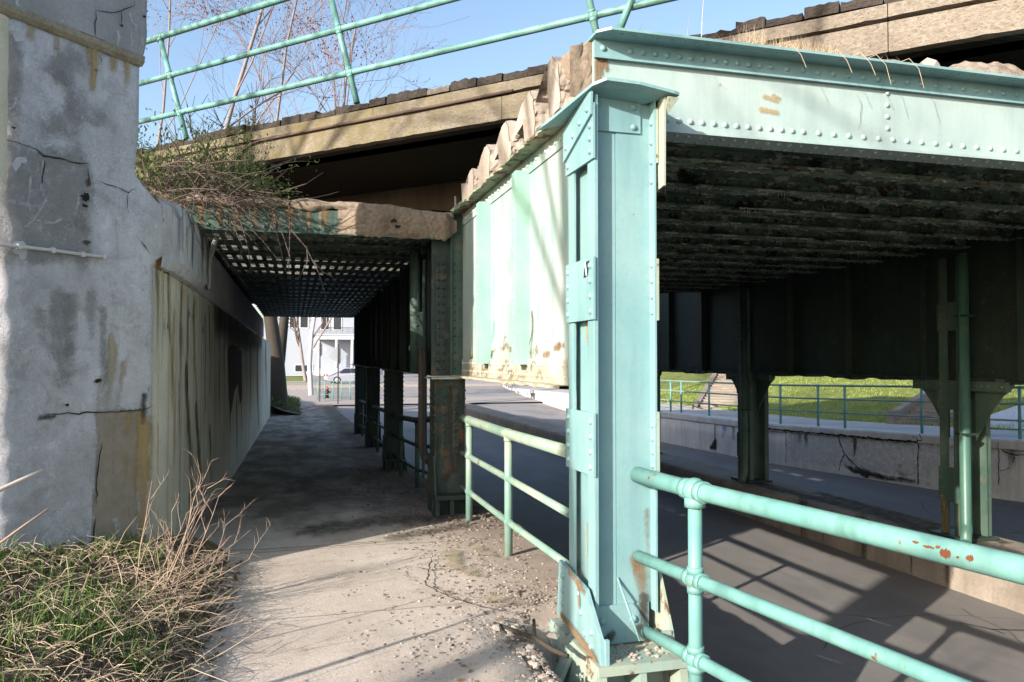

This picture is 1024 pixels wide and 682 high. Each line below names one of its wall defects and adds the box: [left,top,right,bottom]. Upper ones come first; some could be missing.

crack [94,2,135,62]
crack [7,140,134,212]
crack [51,407,150,415]
crack [769,428,922,475]
crack [93,447,102,544]
rust [568,568,584,606]
rust [560,612,597,662]